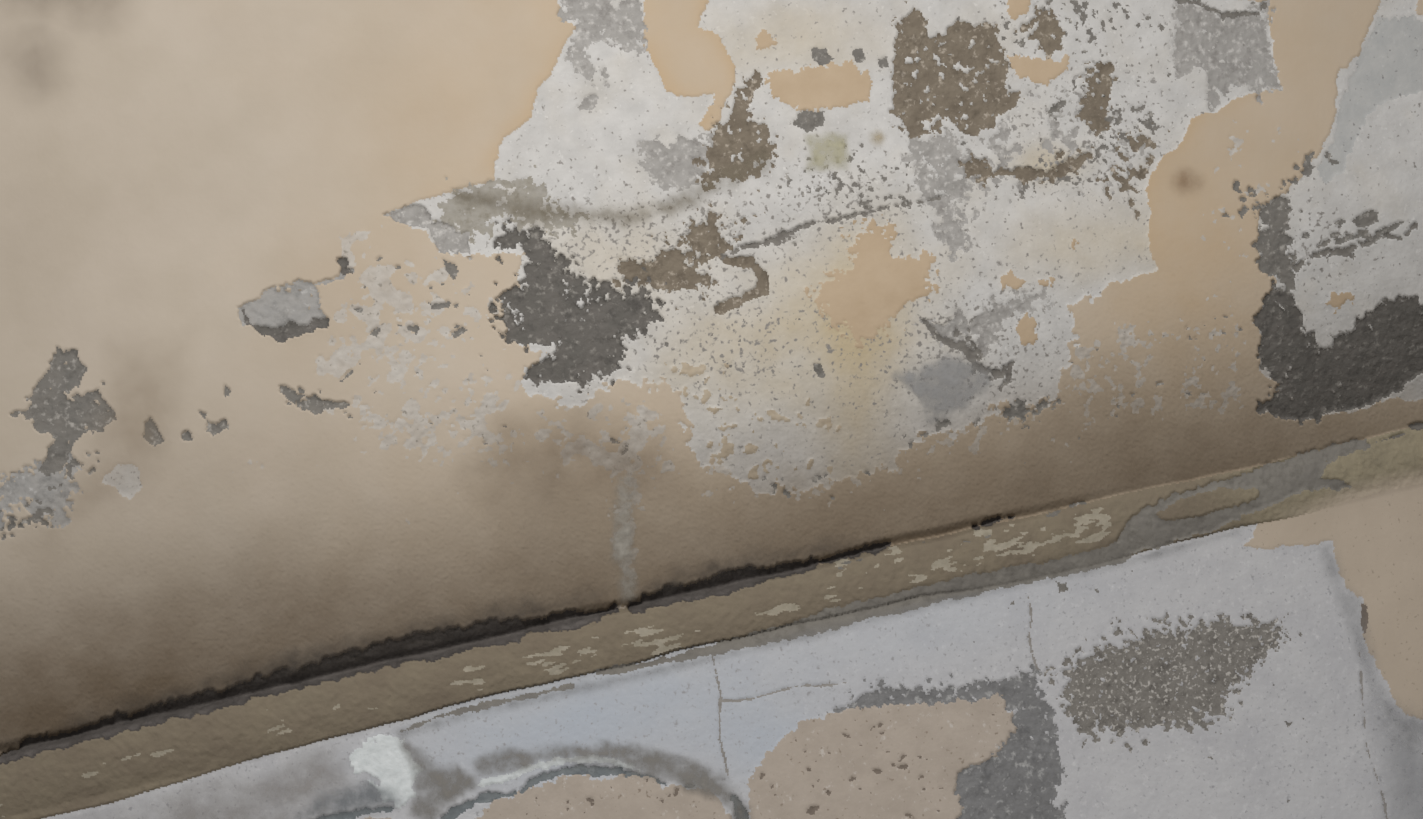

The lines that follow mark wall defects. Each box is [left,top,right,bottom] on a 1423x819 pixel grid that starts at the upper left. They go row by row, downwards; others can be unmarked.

crack [1173,0,1267,21]
peeling [238,0,1423,507]
flaking render [0,347,142,540]
leakage [0,487,891,765]
peeling [41,438,1423,819]
leakage [596,541,1132,676]
leakage [972,516,1015,530]
leakage [317,682,749,819]